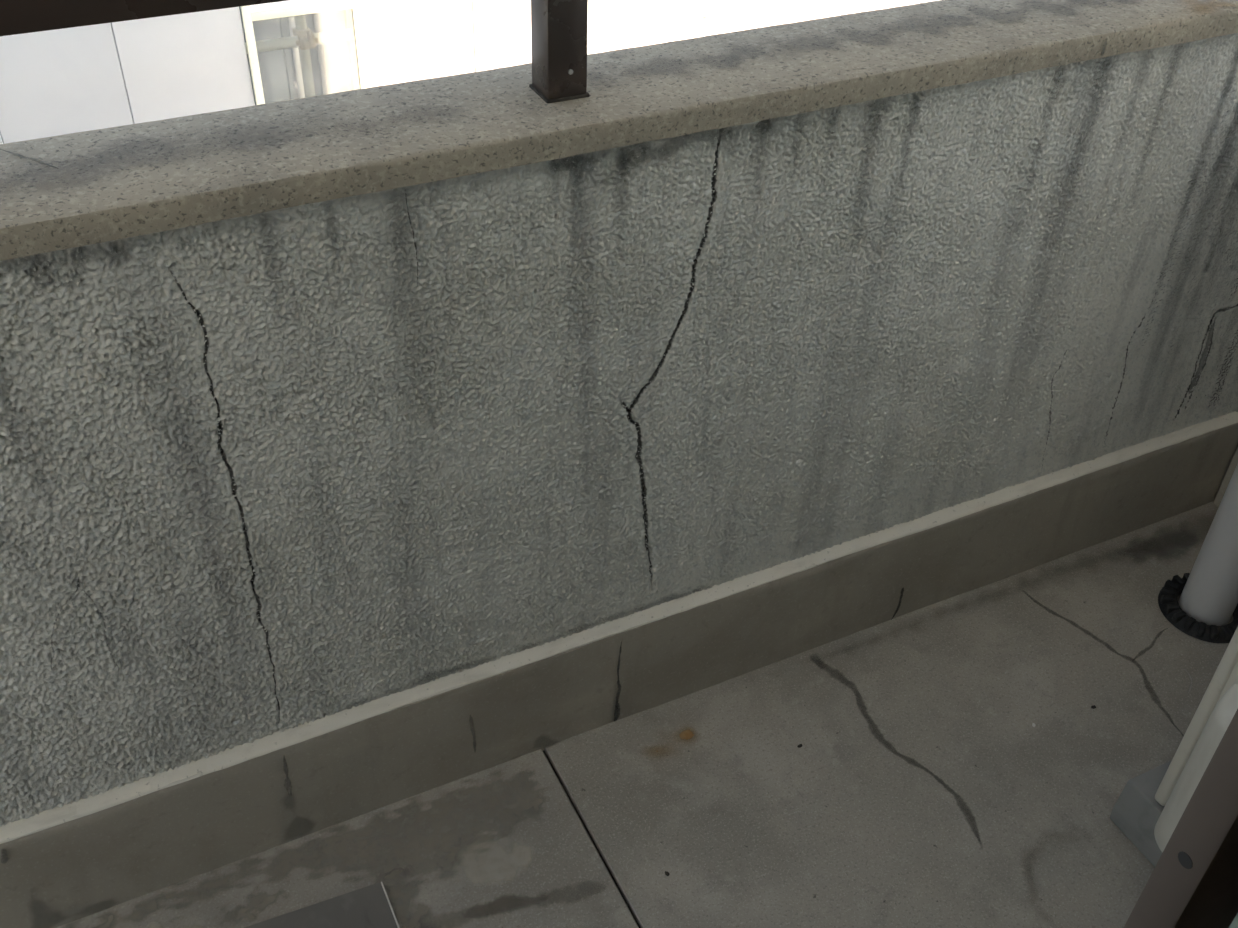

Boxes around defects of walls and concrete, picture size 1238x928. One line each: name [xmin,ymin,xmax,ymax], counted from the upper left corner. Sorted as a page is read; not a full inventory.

crack [175,279,280,715]
crack [621,140,720,579]
crack [815,660,981,843]
crack [1028,595,1184,737]